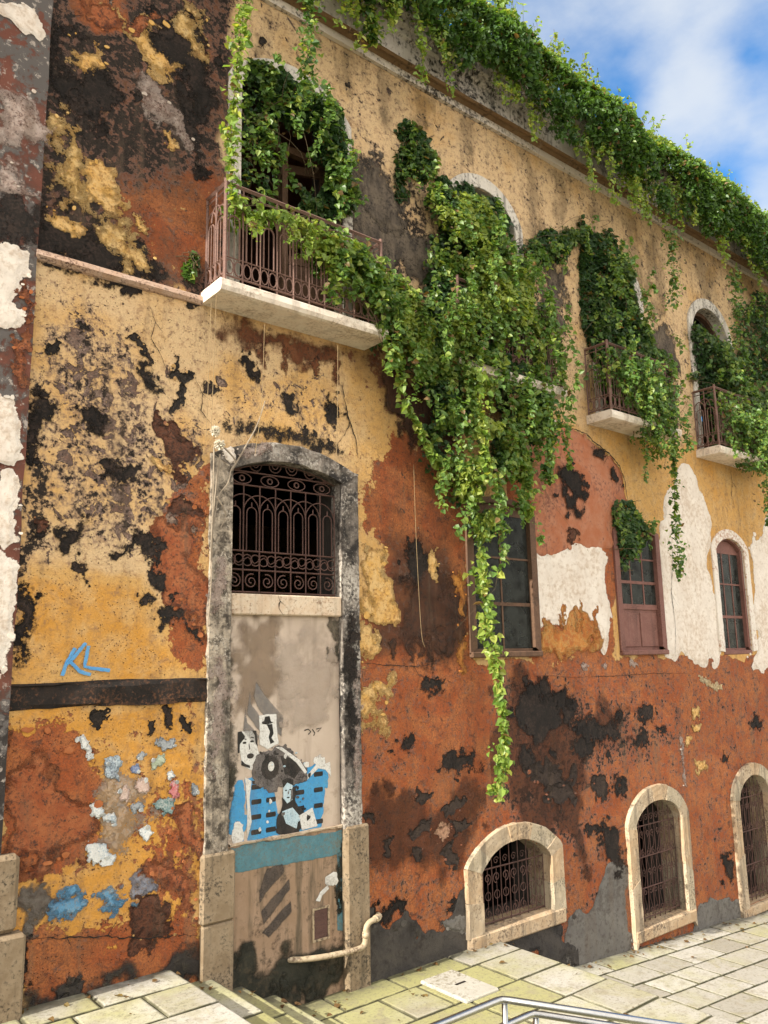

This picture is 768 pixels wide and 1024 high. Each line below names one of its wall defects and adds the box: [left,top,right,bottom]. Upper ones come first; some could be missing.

peeling [0,88,157,275]
leakage [0,191,168,299]
leakage [49,1,224,183]
peeling [0,242,69,679]
leakage [26,386,110,470]
leakage [108,528,204,645]
peeling [353,543,401,792]
leakage [387,536,467,699]
corrosion [541,600,604,661]
peeling [537,527,613,655]
peeling [659,463,723,691]
leakage [365,664,667,882]